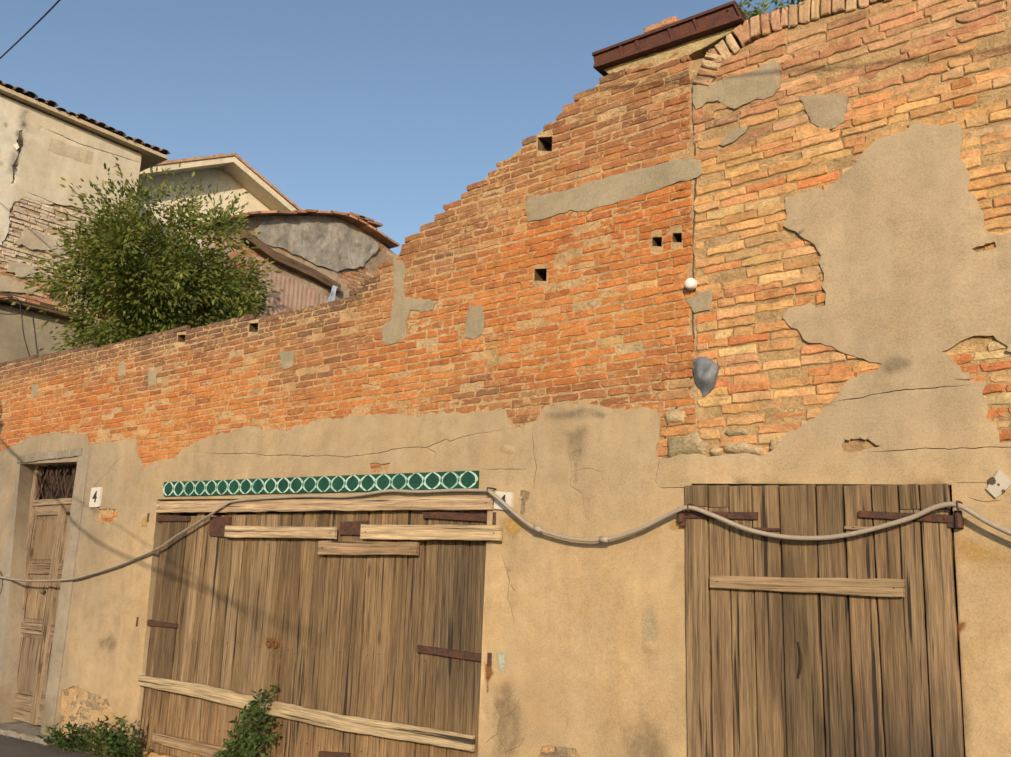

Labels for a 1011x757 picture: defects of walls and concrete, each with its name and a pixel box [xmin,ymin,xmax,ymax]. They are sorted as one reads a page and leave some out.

crack [834,384,969,402]
flaking render [944,336,1011,448]
flaking render [60,686,115,752]
flaking render [540,747,576,757]